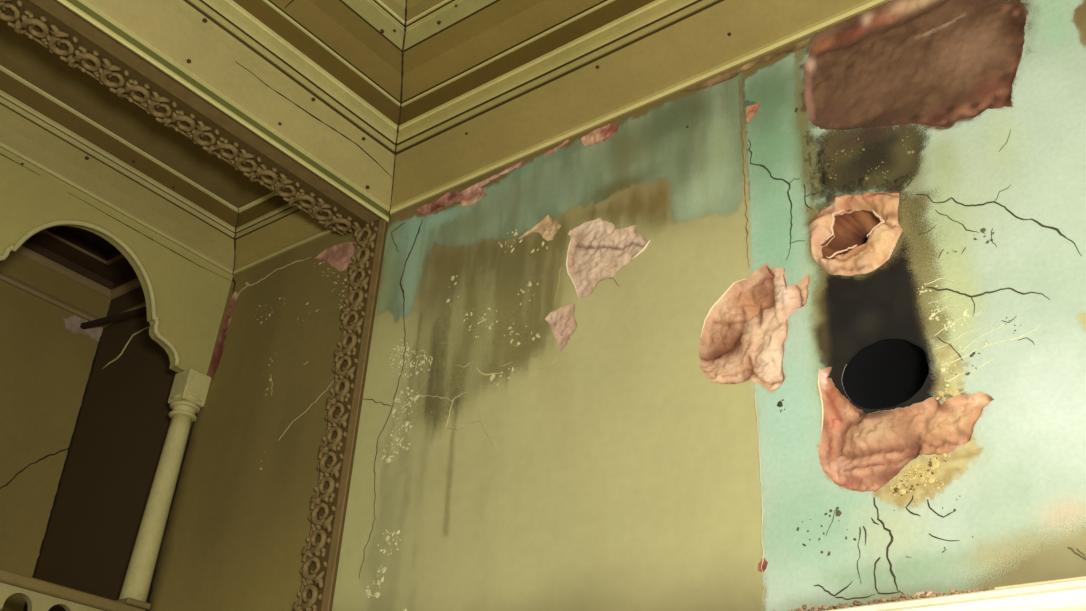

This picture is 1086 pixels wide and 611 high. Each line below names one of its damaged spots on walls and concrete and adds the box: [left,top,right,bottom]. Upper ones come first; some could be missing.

peeling [208,242,356,379]
peeling [417,159,526,215]
spalling [499,214,651,352]
peeling [544,124,619,155]
crack [739,79,822,263]
spalling [681,0,1042,593]
crack [926,287,1050,345]
crack [902,178,1082,259]
crack [0,336,101,578]
damp [357,174,683,611]
crack [814,497,911,600]
crack [906,495,960,553]